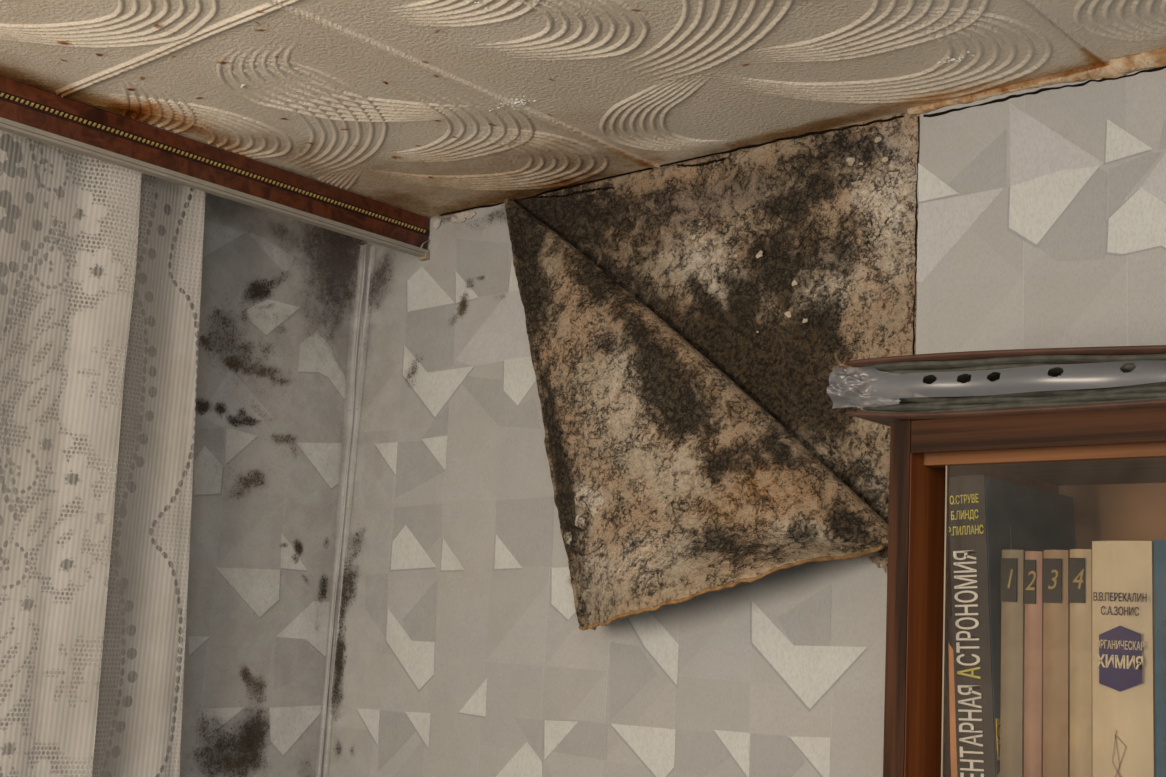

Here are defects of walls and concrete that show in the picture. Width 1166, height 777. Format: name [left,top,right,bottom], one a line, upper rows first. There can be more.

leakage [0,69,134,120]
leakage [195,272,289,427]
leakage [303,227,391,335]
flaking render [514,112,920,524]
leakage [234,471,268,499]
flaking render [868,546,888,573]
leakage [331,531,364,717]
leakage [194,668,270,777]